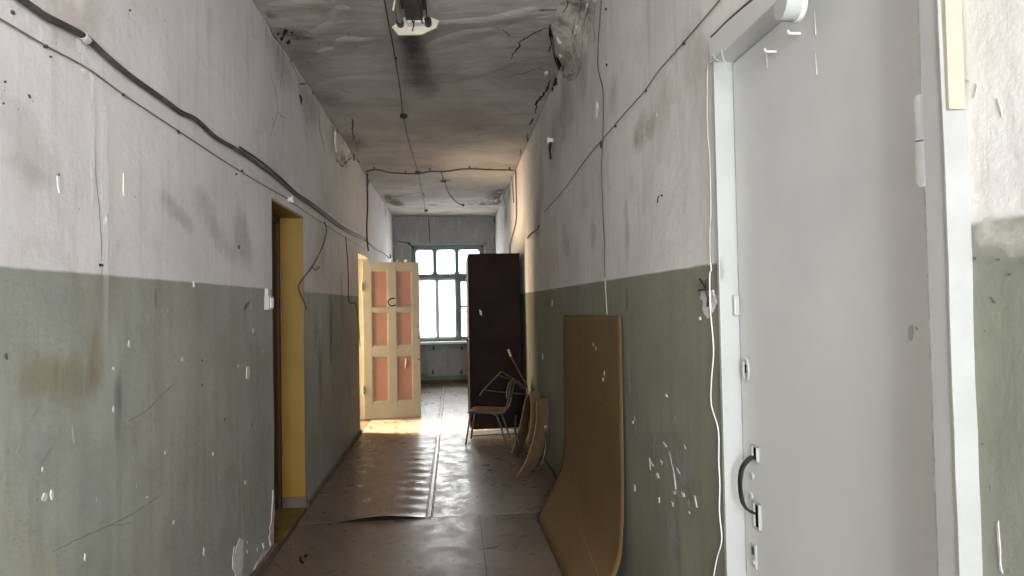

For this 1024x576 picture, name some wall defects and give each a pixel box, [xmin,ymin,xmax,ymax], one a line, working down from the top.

crack [497,0,595,154]
flaking render [698,278,718,320]
peeling [232,490,275,576]